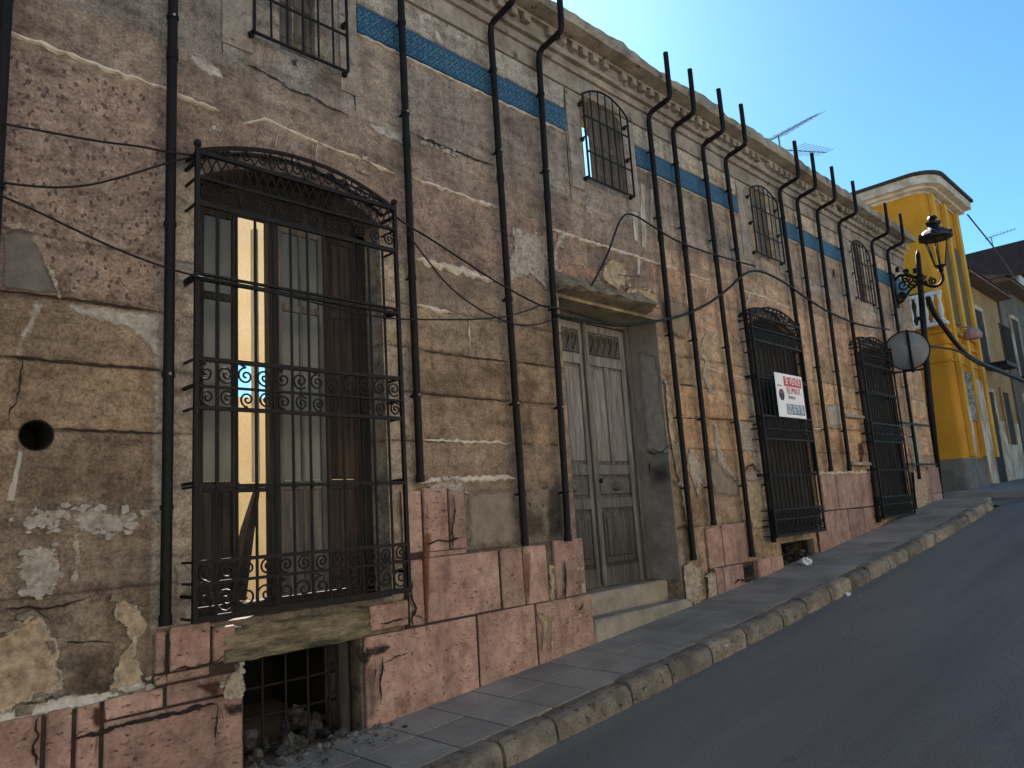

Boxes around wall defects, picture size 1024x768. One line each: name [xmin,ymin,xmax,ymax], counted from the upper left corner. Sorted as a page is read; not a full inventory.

peeling [509,225,658,308]
crack [8,358,24,430]
crack [428,494,461,549]
spalling [0,502,161,717]
crack [374,582,424,704]
spalling [218,661,246,701]
crack [70,702,224,743]